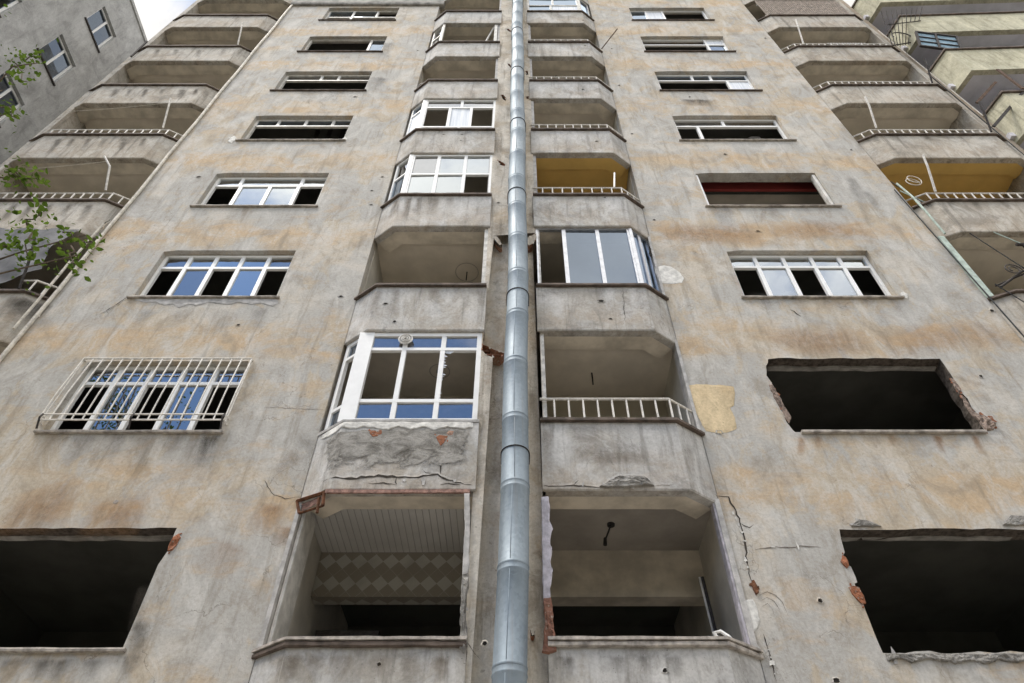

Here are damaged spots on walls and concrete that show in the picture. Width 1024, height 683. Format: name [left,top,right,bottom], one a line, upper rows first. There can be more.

spalling [481,344,504,362]
flaking render [321,422,473,469]
flaking render [541,496,553,599]
crack [716,495,817,614]